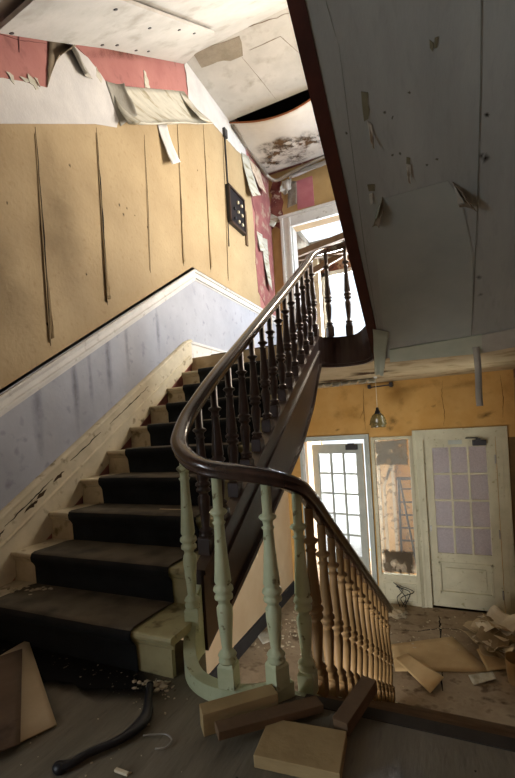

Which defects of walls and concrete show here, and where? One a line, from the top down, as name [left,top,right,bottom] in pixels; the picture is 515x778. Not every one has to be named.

peeling [0,33,49,90]
peeling [76,45,185,92]
spalling [194,36,299,98]
water stain [261,137,318,164]
peeling [241,152,315,306]
crack [0,389,146,536]